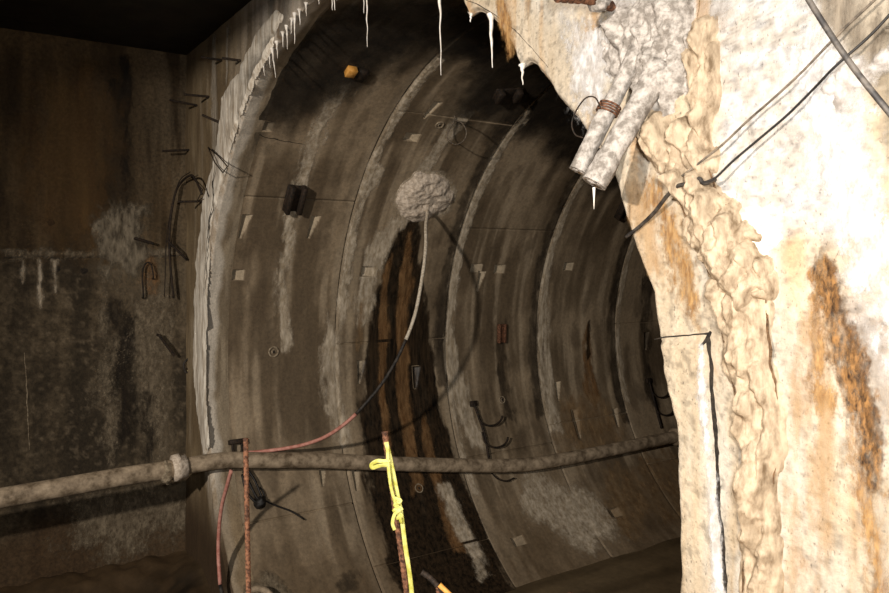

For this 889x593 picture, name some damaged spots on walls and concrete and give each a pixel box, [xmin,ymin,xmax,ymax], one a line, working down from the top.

spalling [554,0,637,13]
damp [259,0,610,458]
damp [361,470,515,593]
efflorescence [521,471,616,553]
crack [654,331,728,593]
corrosion [806,256,889,593]